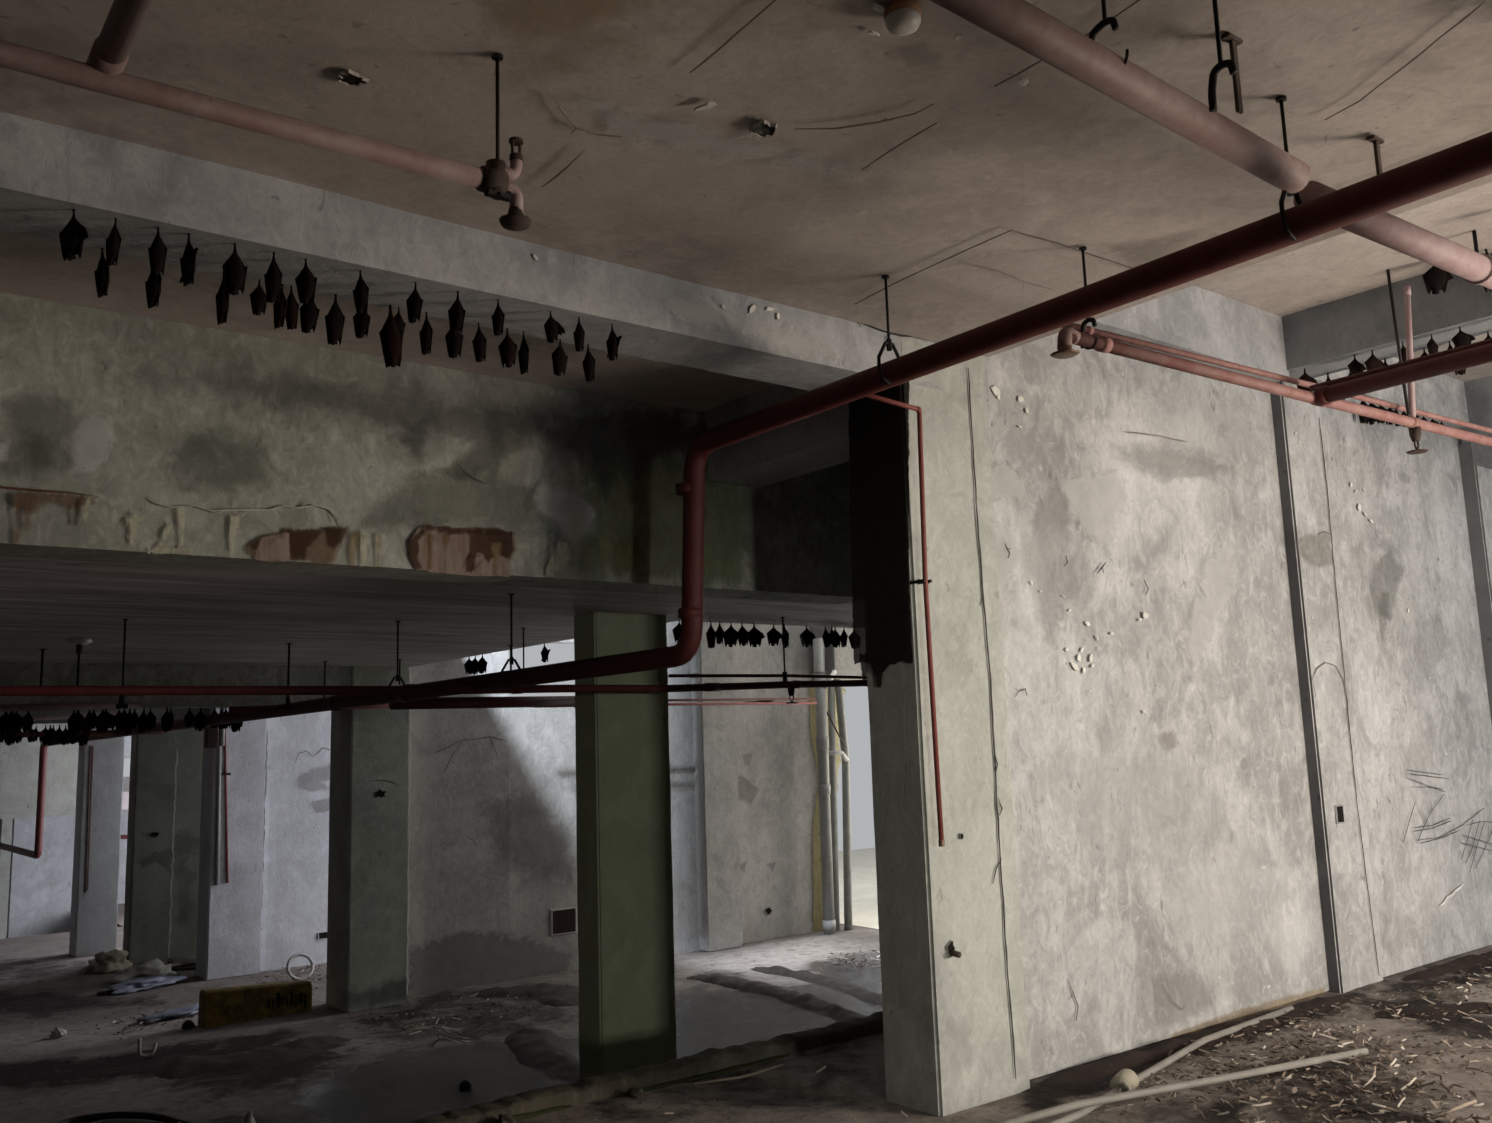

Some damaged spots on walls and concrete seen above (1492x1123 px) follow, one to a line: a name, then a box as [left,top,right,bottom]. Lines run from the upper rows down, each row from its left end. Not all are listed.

spalling [409,525,516,577]